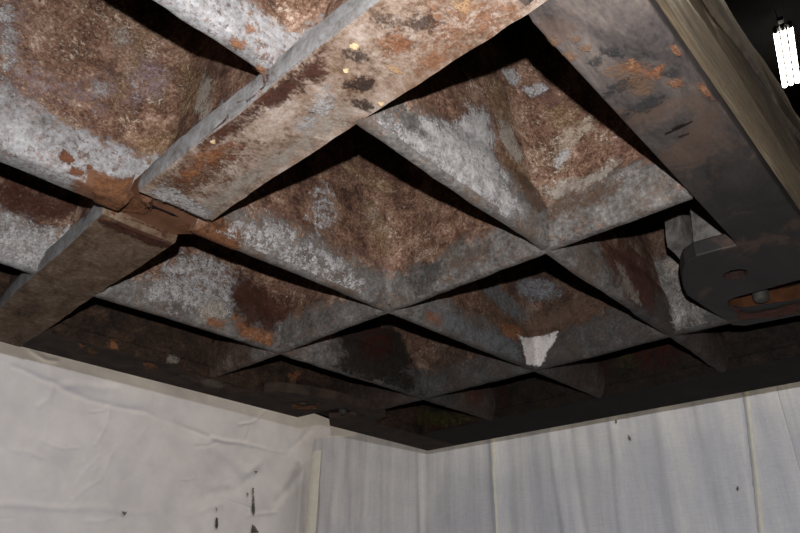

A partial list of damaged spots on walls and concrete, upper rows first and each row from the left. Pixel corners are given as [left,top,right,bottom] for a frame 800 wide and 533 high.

corrosion [599,58,682,95]
corrosion [59,149,93,177]
corrosion [92,175,171,248]
corrosion [179,219,245,251]
water stain [230,275,293,331]
corrosion [205,312,278,347]
peeling [422,305,559,366]